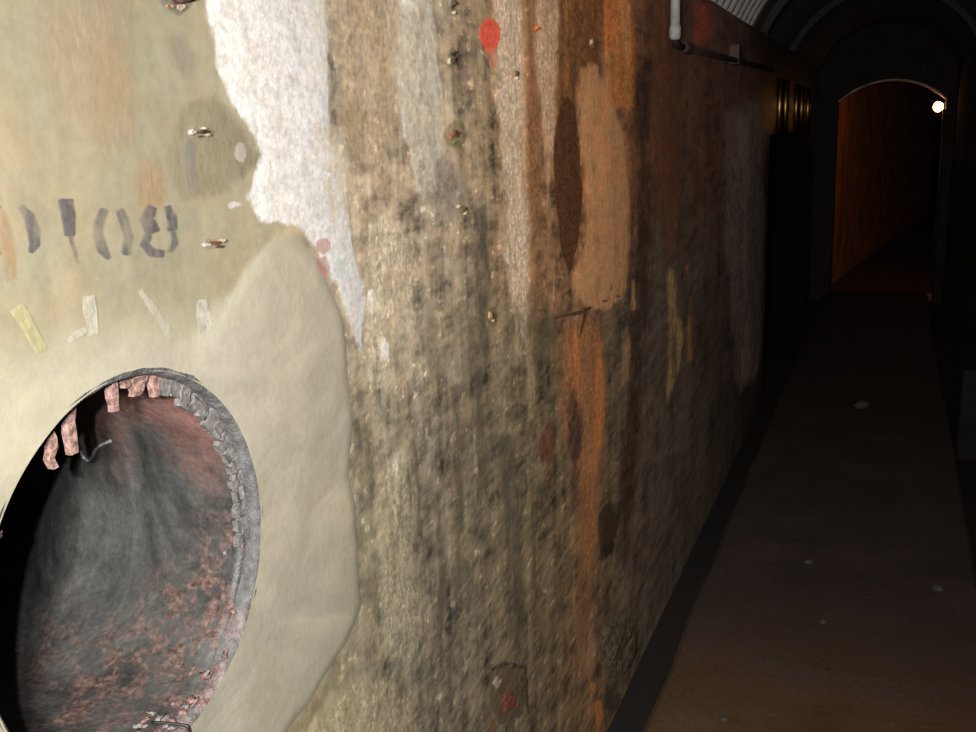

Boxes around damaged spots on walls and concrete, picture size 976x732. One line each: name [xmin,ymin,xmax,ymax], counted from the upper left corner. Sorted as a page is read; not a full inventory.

spalling [166,0,191,11]
spalling [189,127,211,137]
spalling [202,239,226,248]
peeling [207,0,365,346]
water stain [343,0,396,186]
water stain [367,218,415,377]
water stain [473,211,490,354]
water stain [495,0,529,305]
water stain [536,0,558,146]
corrosion [563,322,605,563]
water stain [372,442,421,657]
corrosion [133,695,199,730]